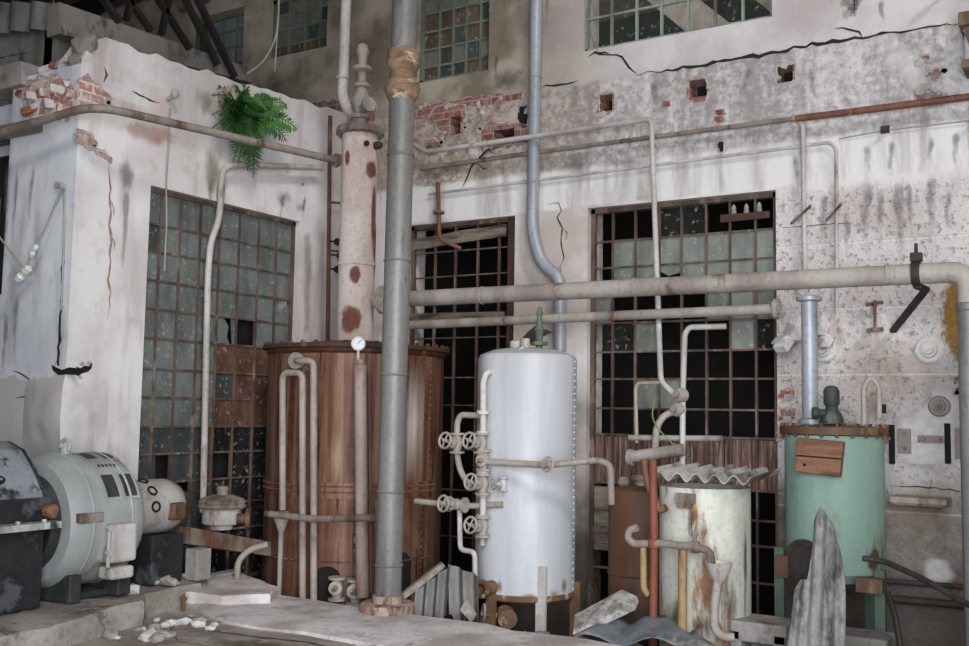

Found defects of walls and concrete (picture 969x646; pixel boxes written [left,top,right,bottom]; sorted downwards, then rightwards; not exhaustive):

spalling [22,31,113,164]
spalling [413,91,529,186]
spalling [686,75,714,106]
spalling [714,109,726,123]
crack [588,23,957,75]
spalling [775,62,800,84]
crack [107,169,116,314]